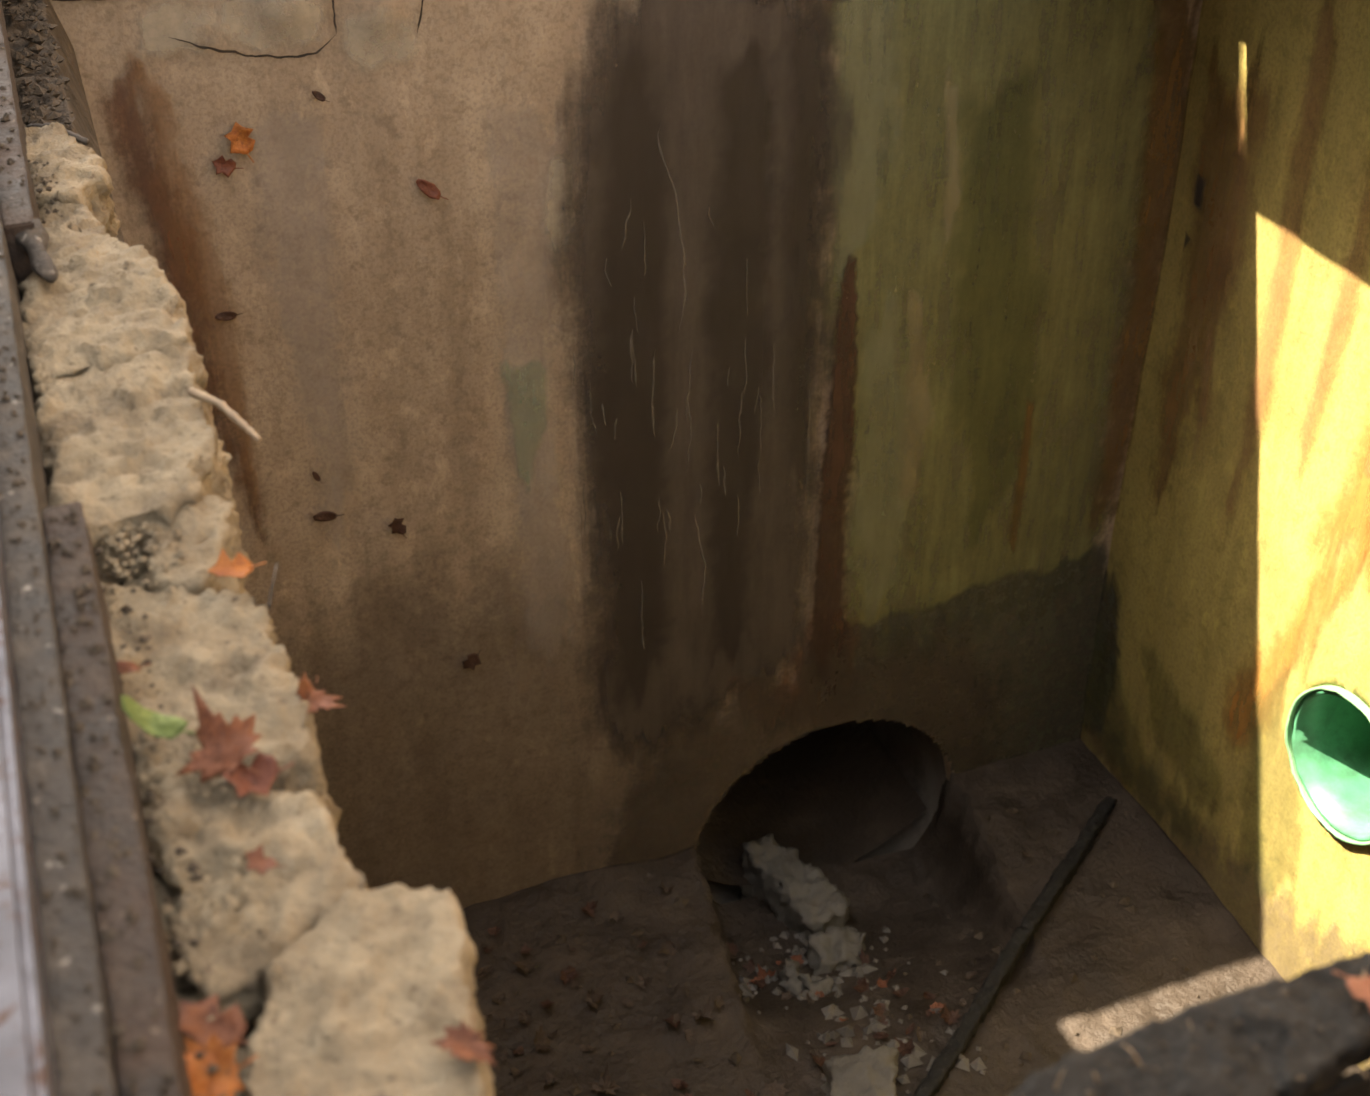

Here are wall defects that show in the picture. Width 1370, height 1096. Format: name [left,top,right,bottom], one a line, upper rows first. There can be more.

crack [169,0,337,59]
rust [773,256,859,713]
leakage [557,0,1120,867]
rust [1154,45,1261,509]